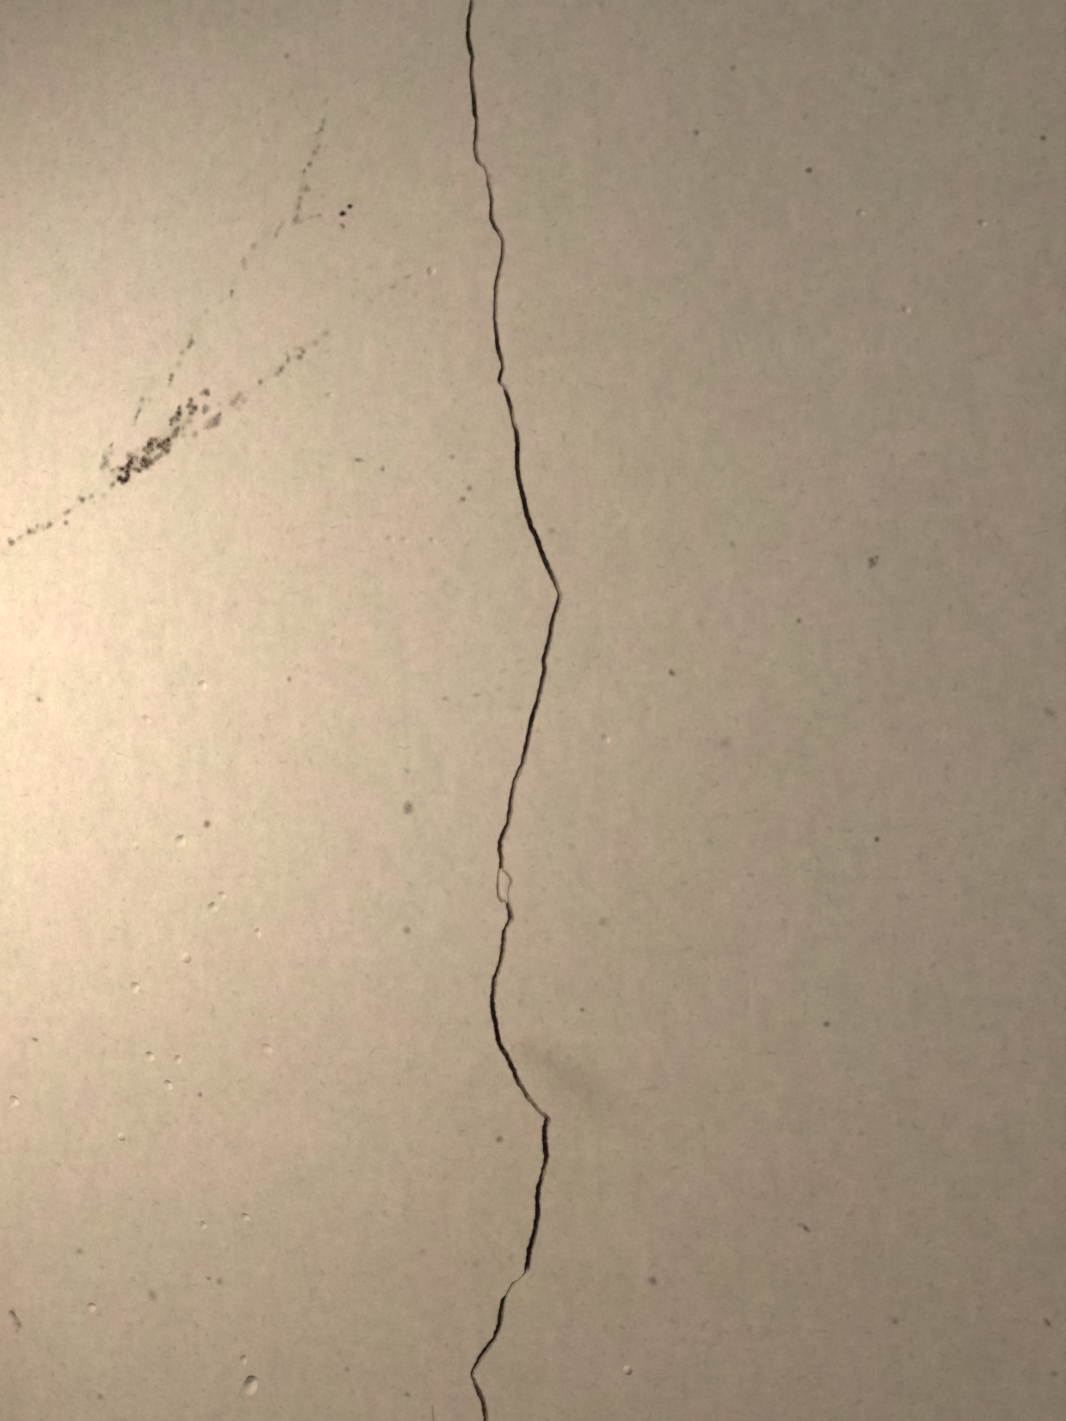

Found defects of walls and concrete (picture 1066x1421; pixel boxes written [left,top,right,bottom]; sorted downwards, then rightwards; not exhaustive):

crack [466,0,561,1421]